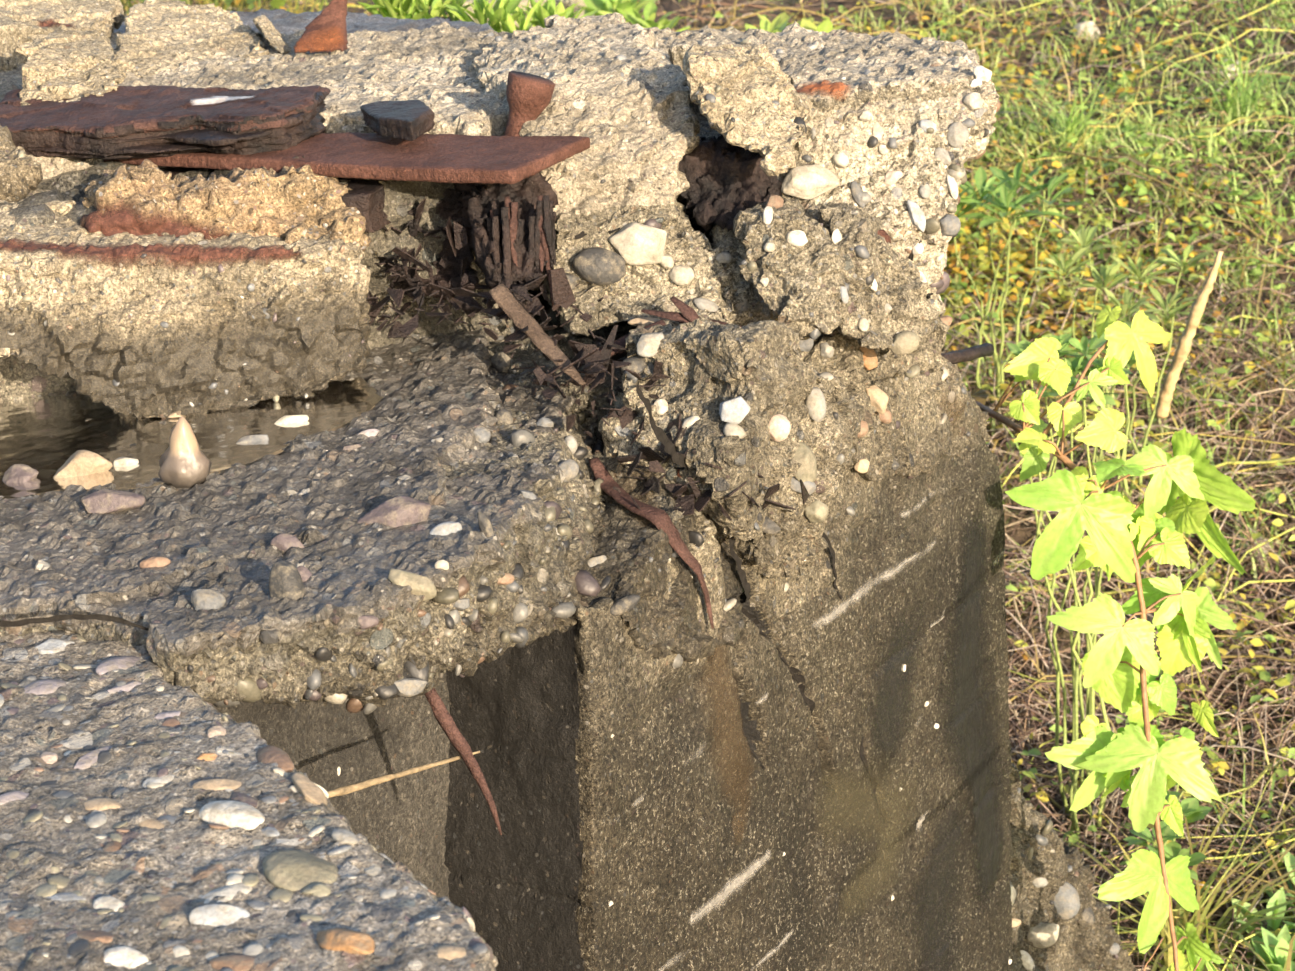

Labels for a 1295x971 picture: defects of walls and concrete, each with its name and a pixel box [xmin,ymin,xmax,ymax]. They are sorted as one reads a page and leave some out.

peeling [193,96,252,105]
spalling [777,65,1001,315]
rust [0,205,299,265]
spalling [759,302,779,321]
crack [636,384,689,470]
spalling [0,336,640,714]
spalling [657,449,884,638]
crack [822,532,843,602]
crack [0,614,149,631]
spalling [640,652,706,685]
crack [729,536,815,726]
crack [732,663,765,768]